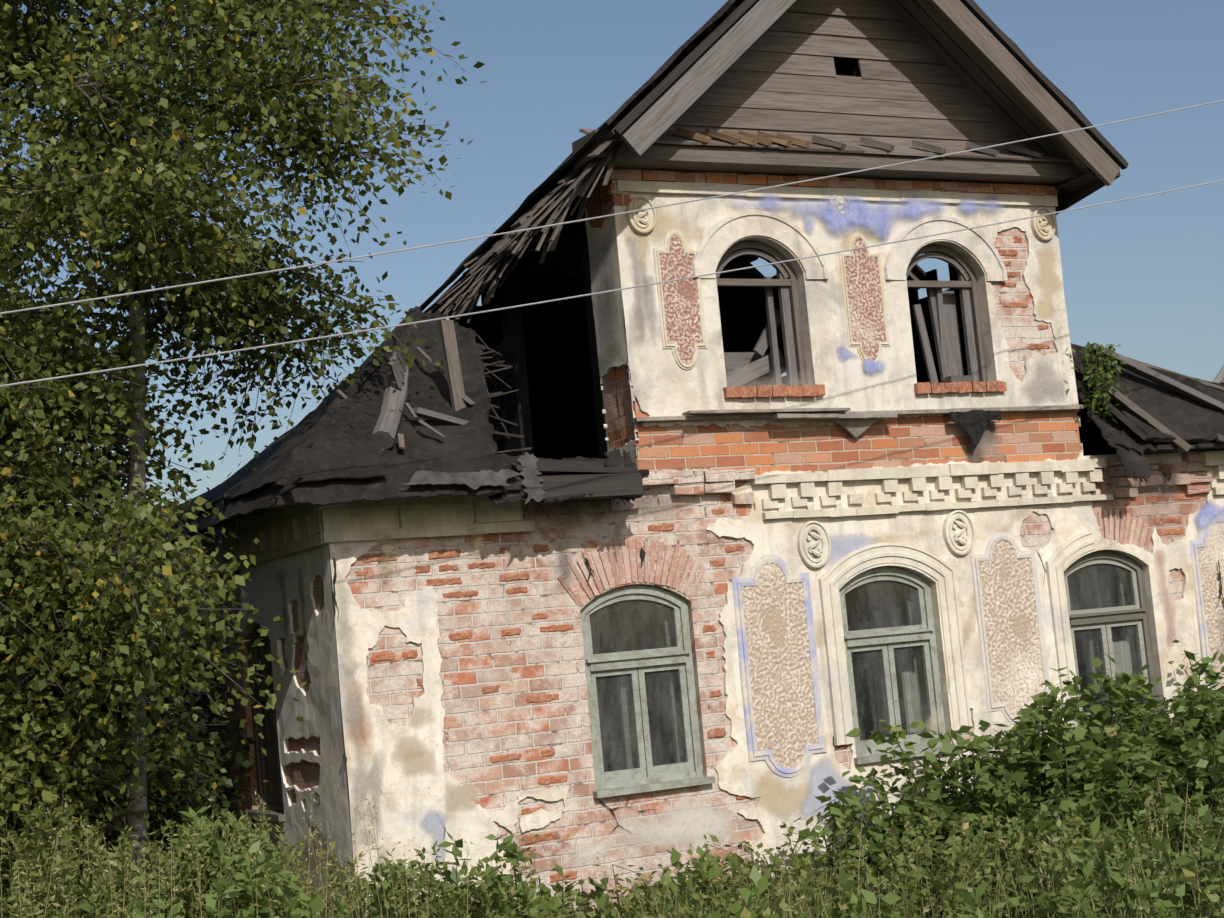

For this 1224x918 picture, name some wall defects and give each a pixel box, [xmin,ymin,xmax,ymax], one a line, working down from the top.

flaking render [990,227,1056,381]
flaking render [1089,452,1213,553]
flaking render [165,569,321,843]
flaking render [313,575,324,612]
flaking render [345,364,1081,916]
crack [1216,561,1224,608]